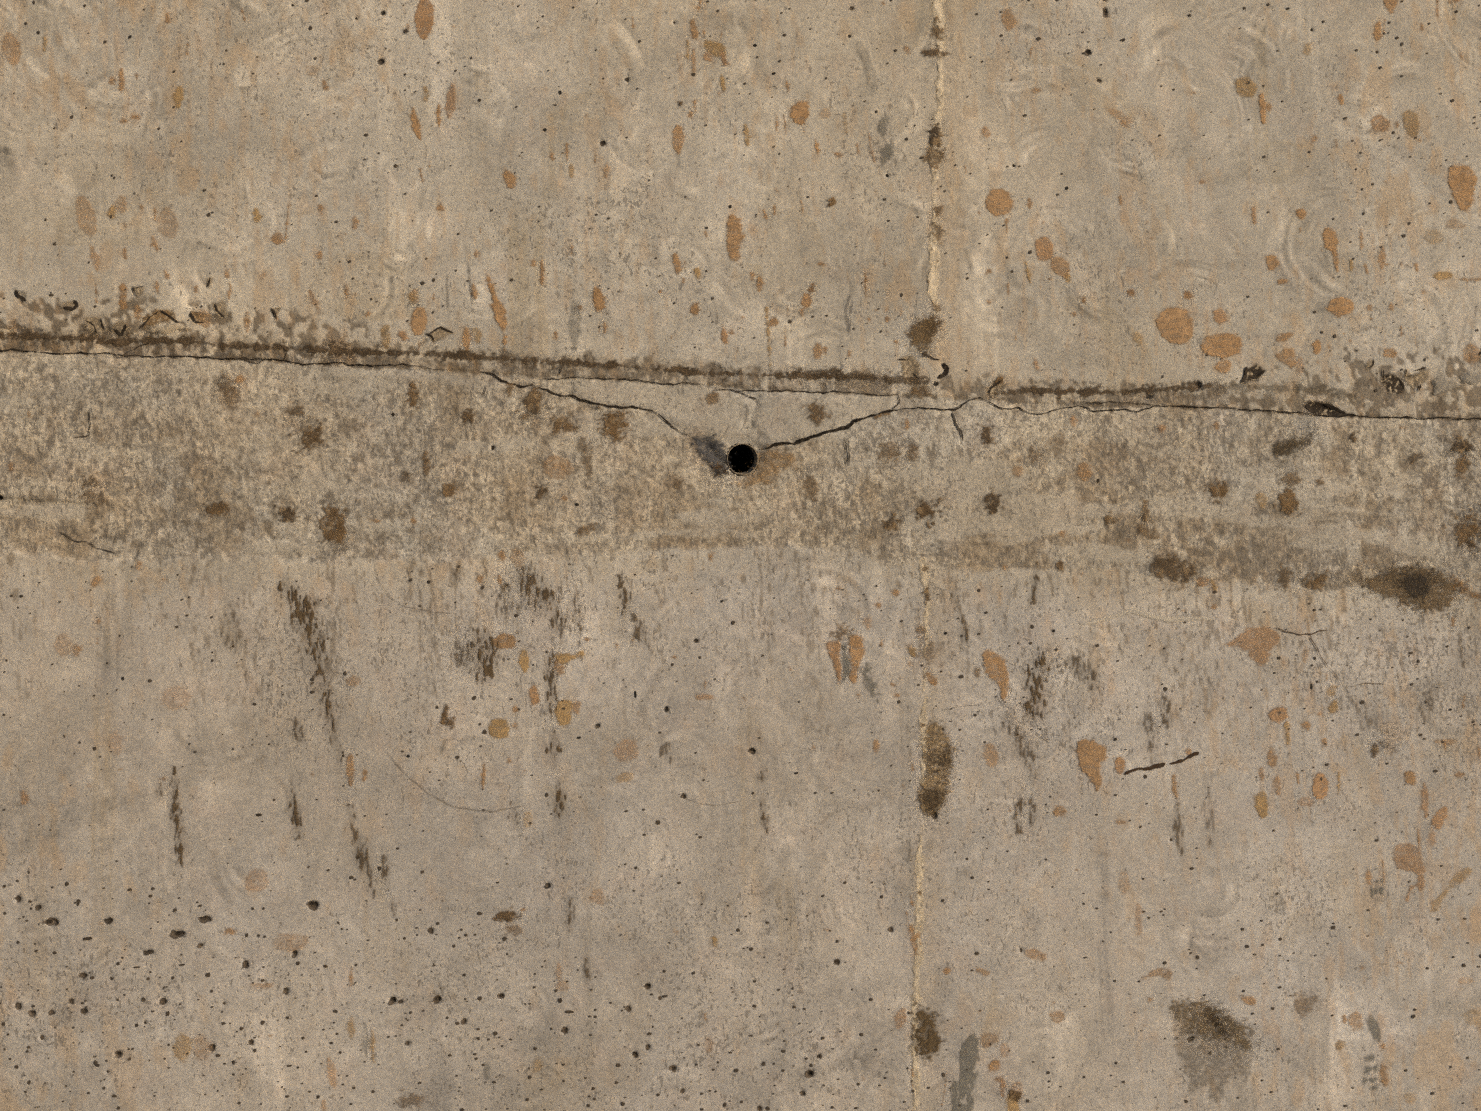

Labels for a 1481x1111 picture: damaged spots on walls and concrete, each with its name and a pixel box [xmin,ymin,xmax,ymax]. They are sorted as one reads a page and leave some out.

crack [0,341,1481,465]
water stain [1362,563,1481,614]
water stain [1405,771,1448,829]
water stain [1169,997,1256,1051]